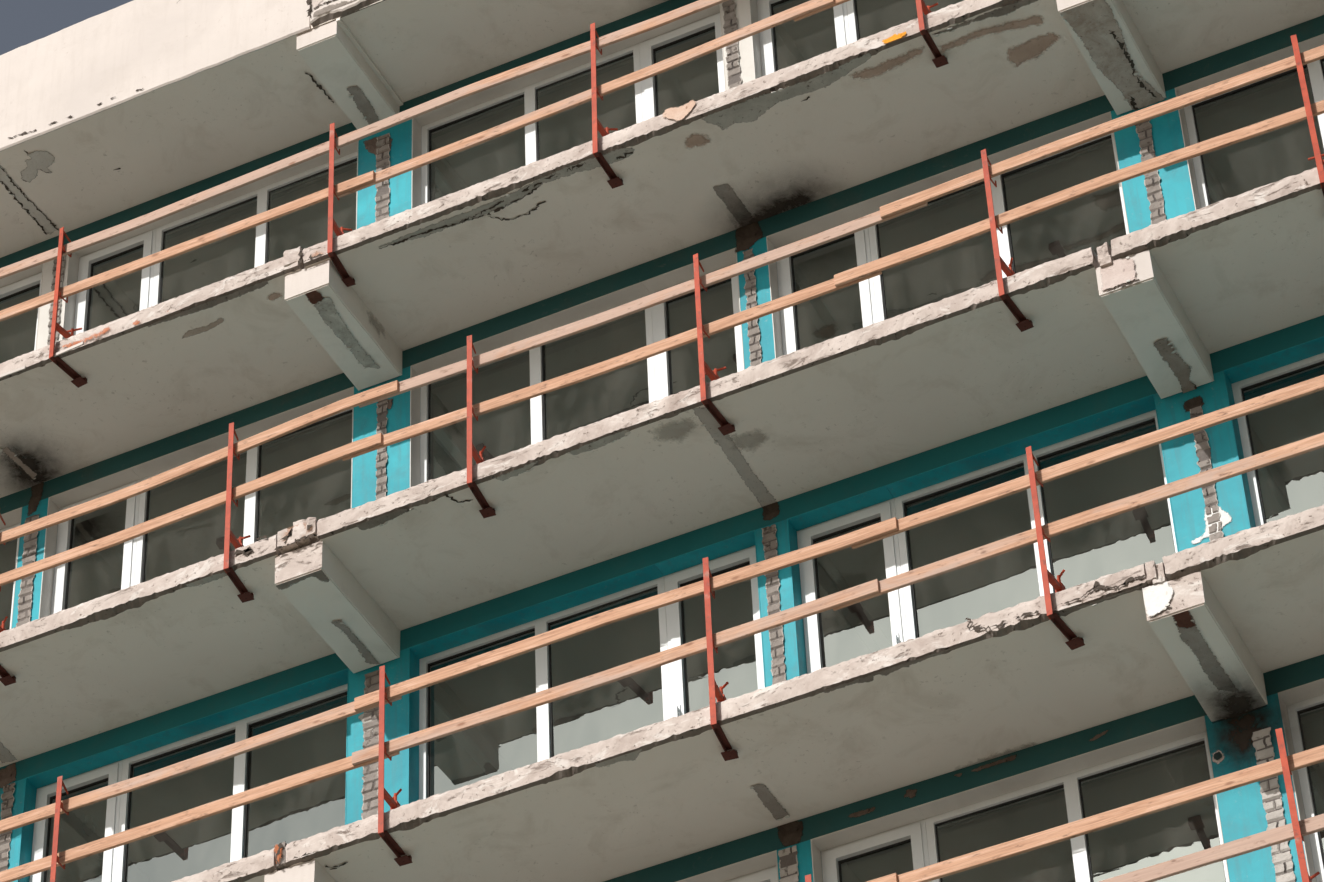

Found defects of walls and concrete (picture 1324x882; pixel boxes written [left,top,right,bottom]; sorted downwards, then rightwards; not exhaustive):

crack [0,150,59,235]
crack [379,164,583,249]
peeling [1154,338,1195,393]
flaking render [1190,406,1231,544]
spalling [257,525,317,550]